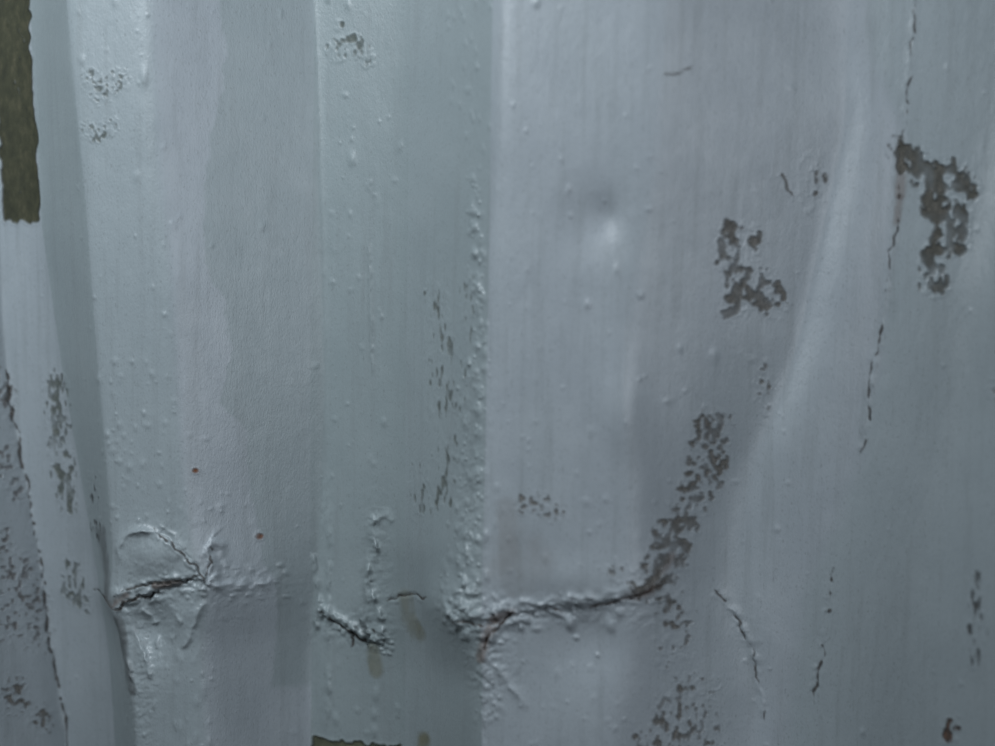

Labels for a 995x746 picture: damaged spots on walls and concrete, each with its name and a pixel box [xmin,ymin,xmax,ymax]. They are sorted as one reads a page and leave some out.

peeling [0,0,40,224]
peeling [895,137,978,268]
peeling [716,219,786,317]
crack [860,326,883,452]
peeling [54,452,73,513]
peeling [630,415,729,629]
crack [94,536,213,611]
crack [321,611,375,646]
crack [452,612,513,649]
crack [593,586,657,607]
peeling [313,736,385,746]
peeling [653,685,695,746]